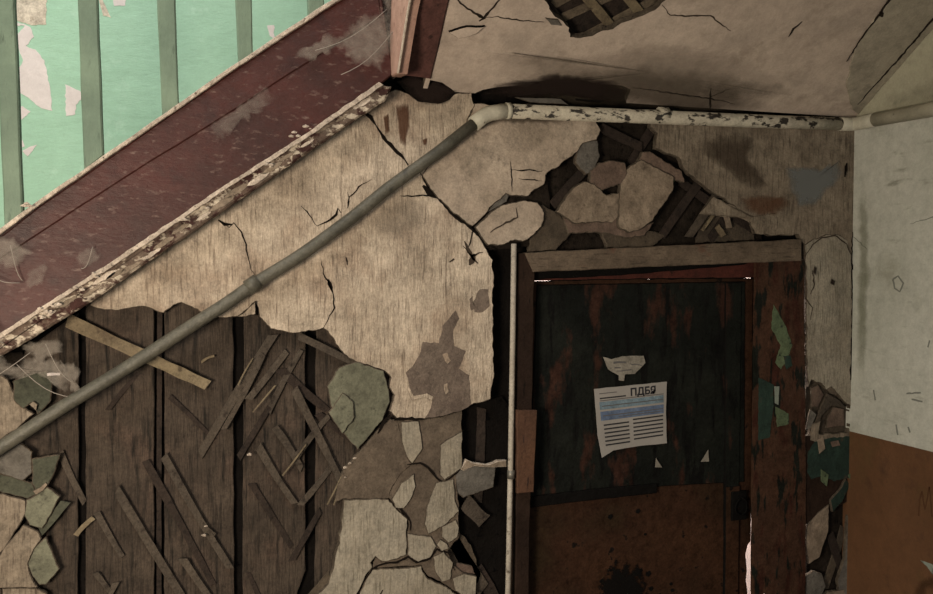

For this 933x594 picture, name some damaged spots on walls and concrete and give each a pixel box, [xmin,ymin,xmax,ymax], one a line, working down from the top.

peeling [17,0,52,120]
crack [458,0,542,22]
flaking render [489,75,625,108]
flaking render [545,0,658,33]
crack [846,0,891,62]
crack [859,18,933,103]
crack [366,113,495,265]
flaking render [470,122,762,252]
flaking render [0,296,509,594]
crack [407,462,460,481]
flaking render [805,381,850,594]
crack [358,548,455,594]